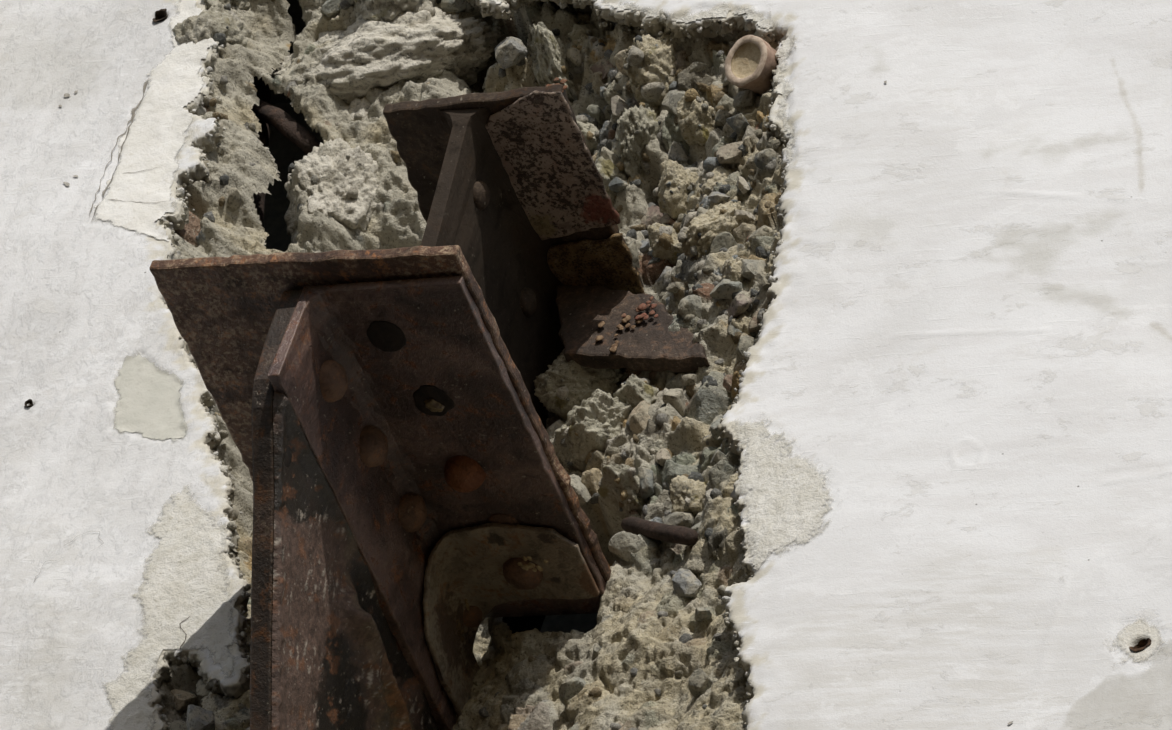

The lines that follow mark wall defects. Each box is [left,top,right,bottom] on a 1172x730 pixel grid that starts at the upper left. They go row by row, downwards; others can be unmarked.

spalling [94,0,834,730]
rust [596,296,658,352]